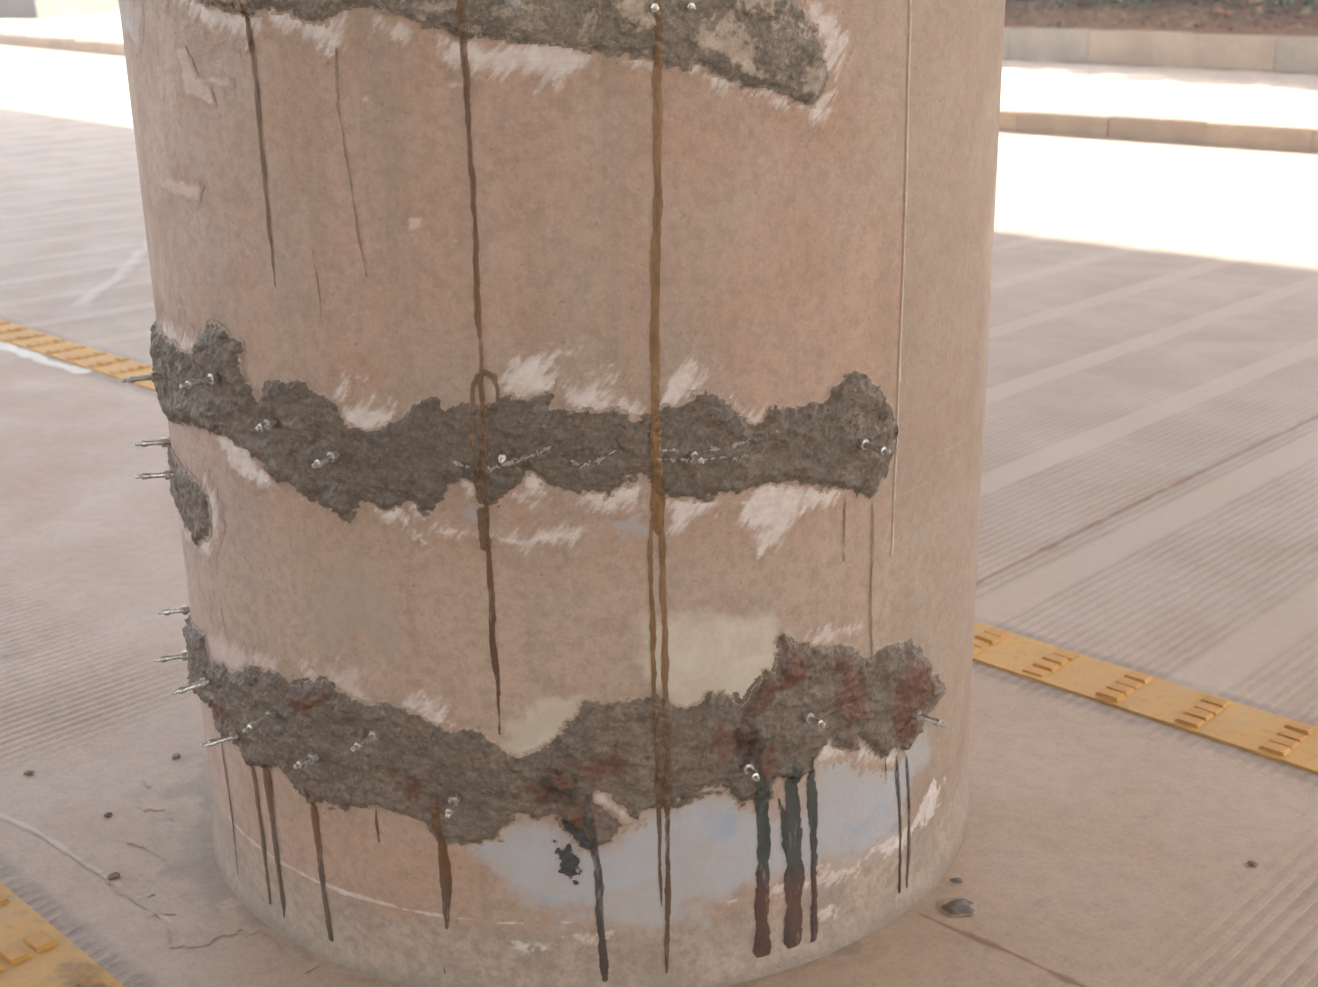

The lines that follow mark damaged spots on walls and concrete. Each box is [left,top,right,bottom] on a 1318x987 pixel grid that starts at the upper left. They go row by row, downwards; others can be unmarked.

peeling [174,43,217,108]
corrosion [238,0,276,286]
flaking render [320,0,419,17]
flaking render [464,13,597,55]
flaking render [602,0,829,105]
corrosion [456,0,501,735]
corrosion [648,0,672,973]
corrosion [208,701,238,875]
corrosion [243,758,285,918]
corrosion [304,787,333,942]
corrosion [431,795,452,929]
spalling [593,790,638,825]